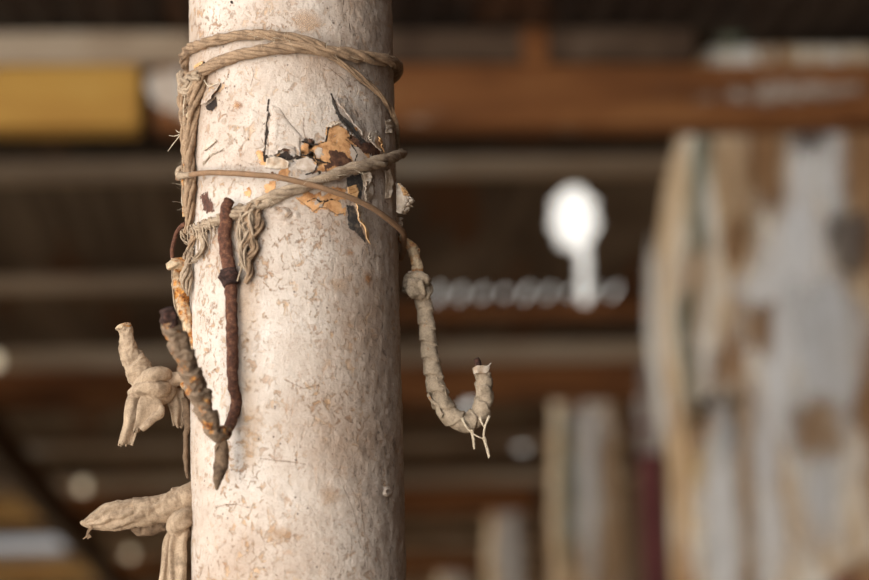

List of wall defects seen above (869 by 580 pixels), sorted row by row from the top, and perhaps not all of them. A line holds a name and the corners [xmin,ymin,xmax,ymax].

crack [245,99,310,162]
peeling [256,93,394,193]
peeling [296,169,415,244]